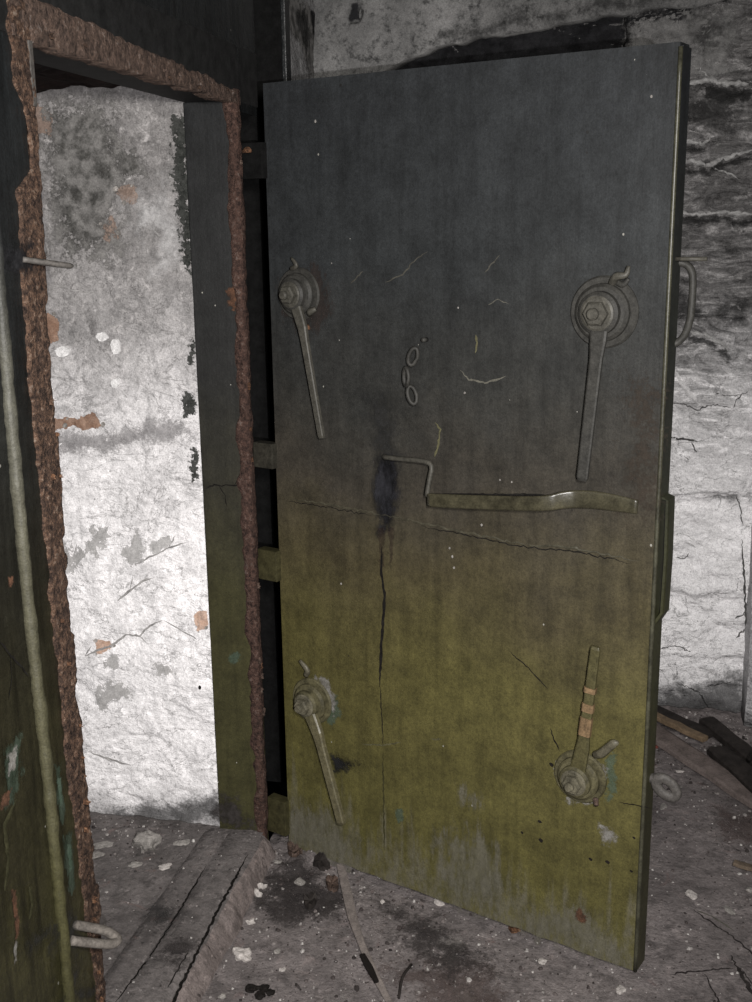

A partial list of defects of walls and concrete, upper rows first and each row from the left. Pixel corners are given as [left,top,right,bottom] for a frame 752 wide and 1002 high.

spalling [47,312,71,357]
crack [673,391,748,411]
spalling [55,412,105,437]
crack [673,437,700,461]
crack [286,498,635,563]
crack [378,548,386,845]
crack [672,909,752,1002]